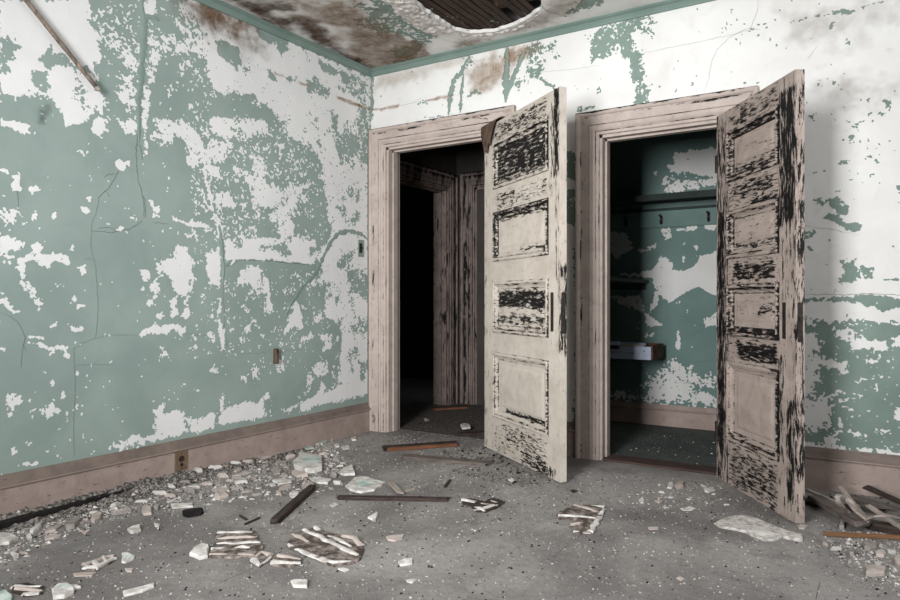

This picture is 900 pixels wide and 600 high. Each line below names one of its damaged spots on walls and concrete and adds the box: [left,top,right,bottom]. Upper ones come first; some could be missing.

leakage [201,4,249,37]
leakage [233,0,427,68]
leakage [479,49,528,90]
peeling [514,40,561,93]
crack [73,0,166,446]
peeling [0,0,382,452]
peeling [813,190,862,232]
crack [218,225,369,354]
peeling [610,224,717,338]
peeling [838,258,899,285]
peeling [610,330,717,408]
peeling [805,289,900,455]